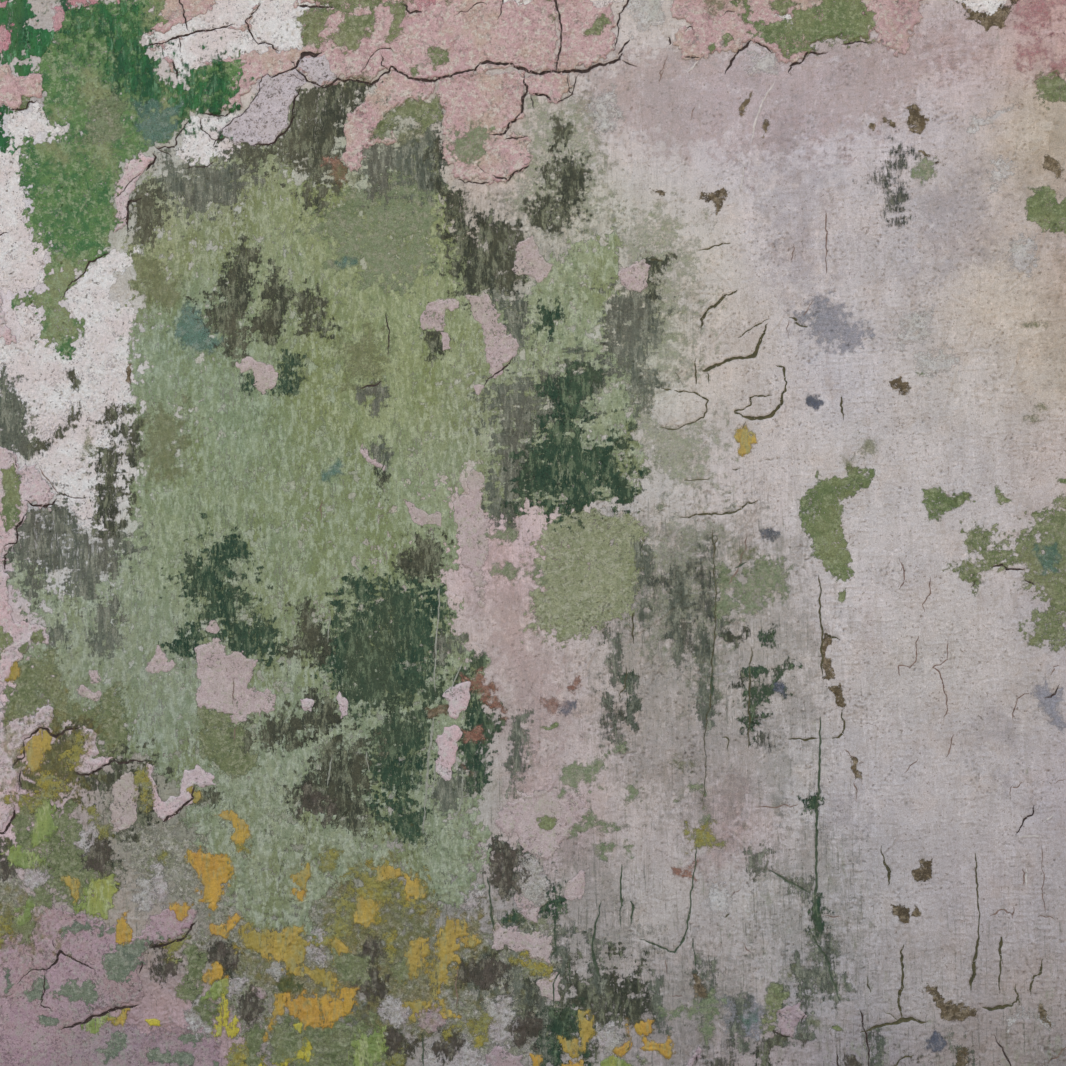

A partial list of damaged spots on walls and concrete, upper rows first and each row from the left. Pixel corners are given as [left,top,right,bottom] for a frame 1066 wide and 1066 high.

crack [115,0,700,229]
crack [725,40,873,74]
flaking render [954,0,1007,16]
peeling [0,0,923,694]
crack [660,300,814,430]
peeling [336,691,348,718]
water stain [158,513,582,855]
peeling [435,681,471,781]
water stain [595,511,803,752]
crack [0,940,138,1030]
water stain [687,875,856,1066]
water stain [902,985,977,1066]